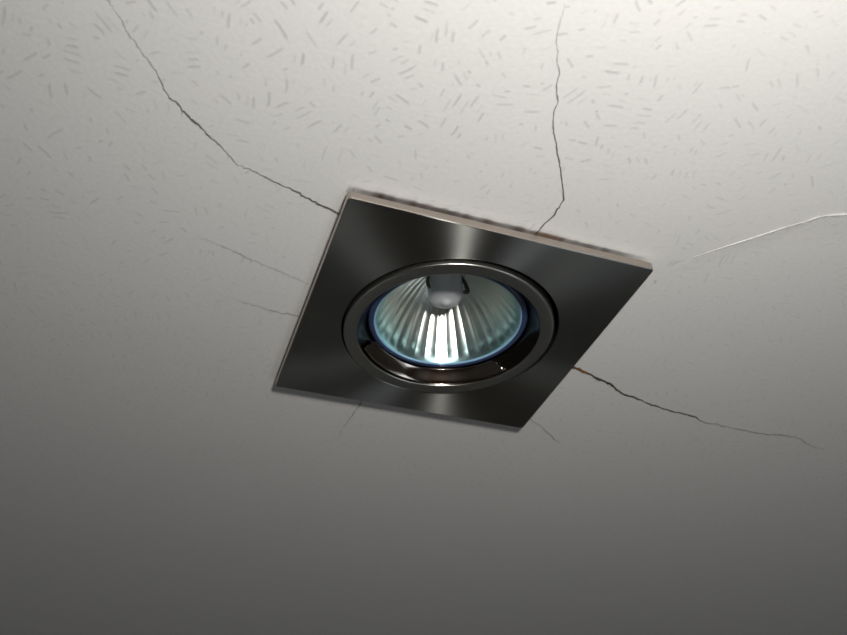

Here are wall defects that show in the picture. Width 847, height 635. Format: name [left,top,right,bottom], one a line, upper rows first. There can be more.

crack [160,80,221,146]
crack [538,71,564,232]
crack [267,178,339,214]
crack [572,367,700,421]